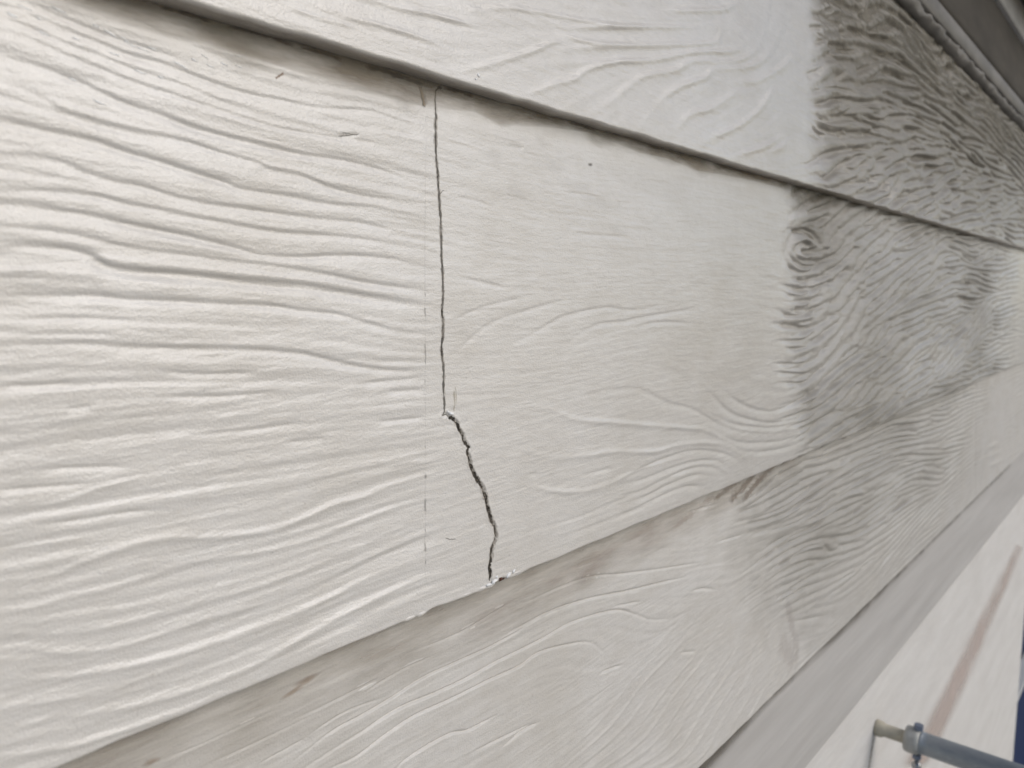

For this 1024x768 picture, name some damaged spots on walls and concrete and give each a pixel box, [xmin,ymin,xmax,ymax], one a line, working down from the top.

crack [434,86,497,583]